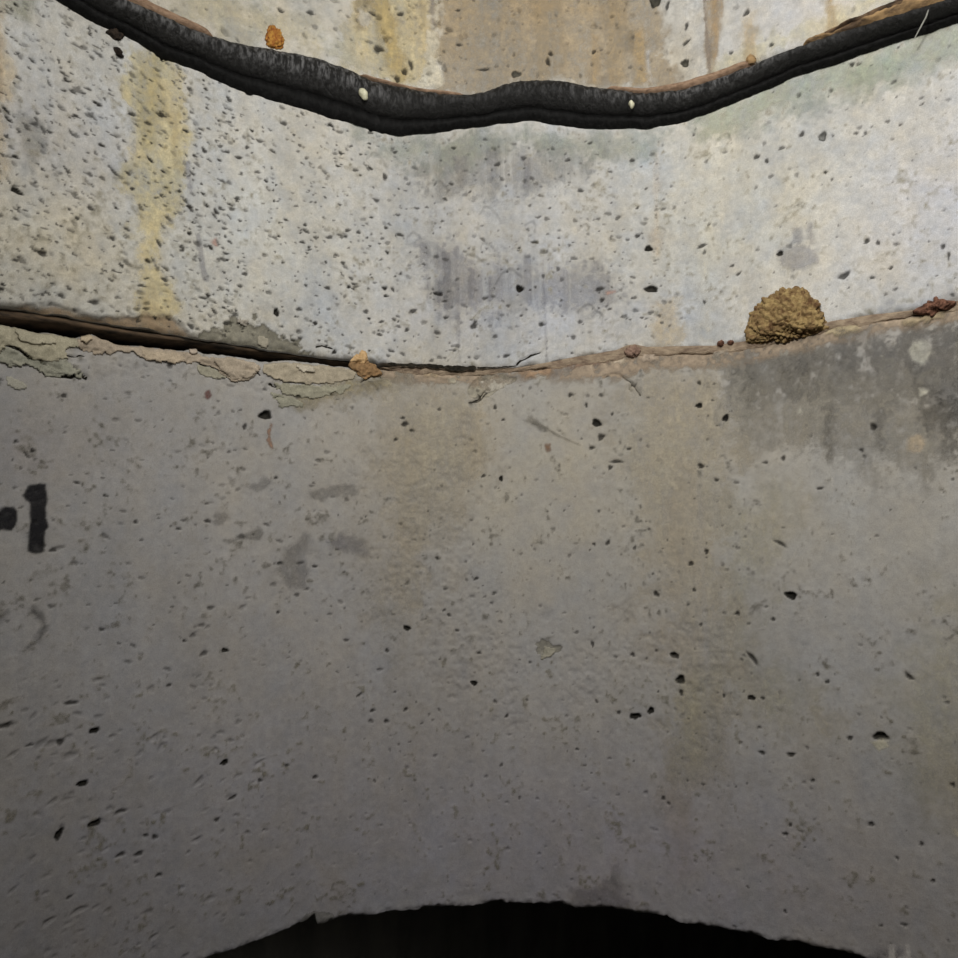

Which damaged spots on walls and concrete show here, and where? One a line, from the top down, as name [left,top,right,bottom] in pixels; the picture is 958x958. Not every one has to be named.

water stain [420,30,443,87]
peeling [0,313,356,408]
water stain [723,314,958,471]